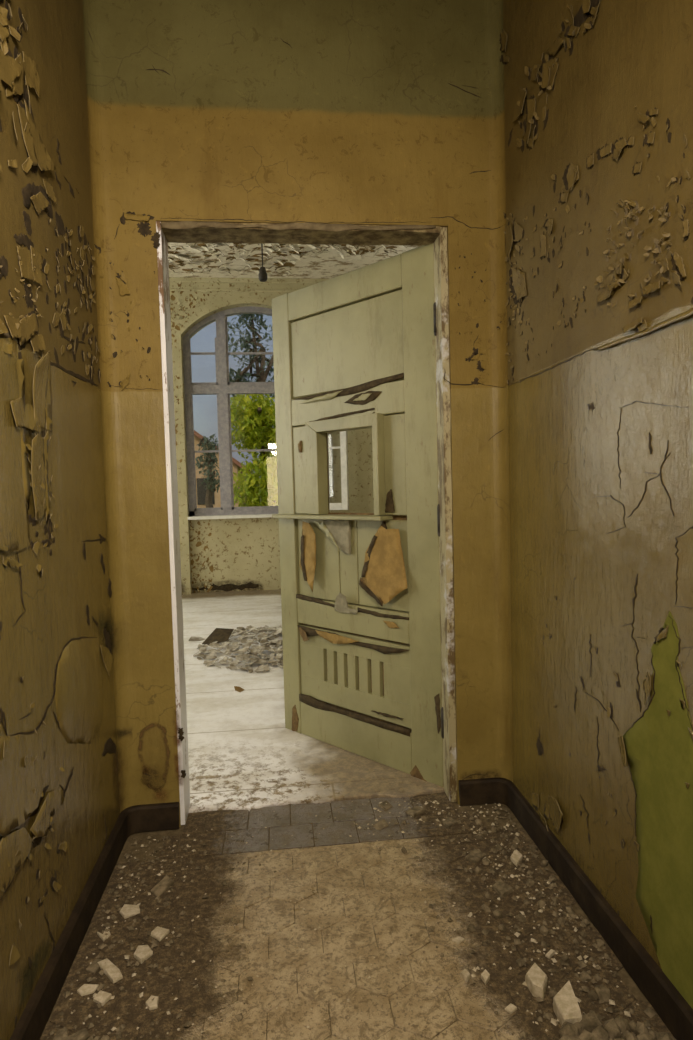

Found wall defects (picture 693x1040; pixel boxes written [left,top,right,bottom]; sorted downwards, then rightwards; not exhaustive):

peeling [0,0,158,578]
peeling [114,211,436,348]
peeling [497,105,693,386]
peeling [179,515,214,593]
crack [599,401,693,608]
peeling [0,721,67,907]
peeling [618,611,693,1009]
spalling [86,958,123,984]